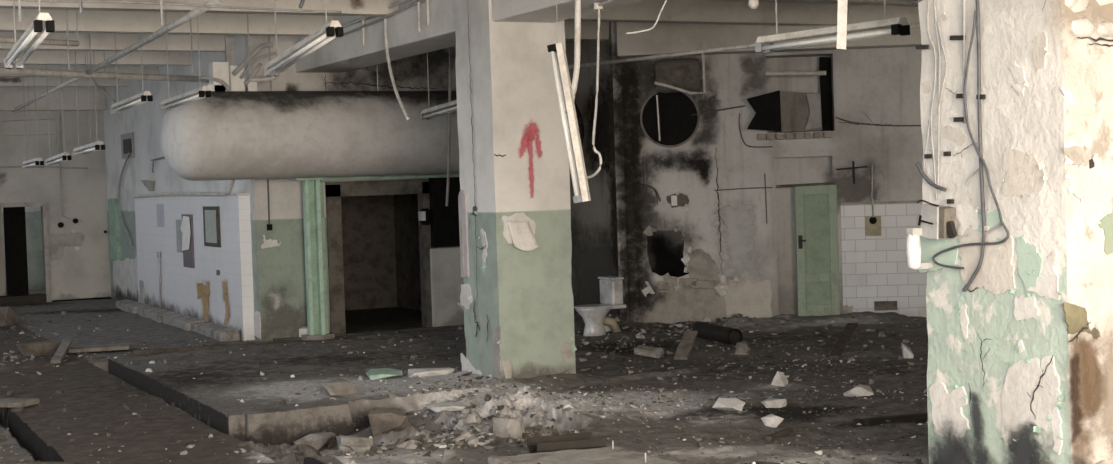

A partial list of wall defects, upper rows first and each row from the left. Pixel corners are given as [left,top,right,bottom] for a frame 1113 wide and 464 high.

damp [608,69,642,300]
spalling [666,188,690,211]
damp [698,160,708,183]
spalling [642,226,773,323]
peeling [956,303,968,339]
peeling [940,200,1062,321]
peeling [928,382,972,438]
damp [928,393,989,464]
damp [1009,423,1052,464]
peeling [1001,340,1064,455]
crack [1027,322,1091,415]
damp [1071,337,1113,464]